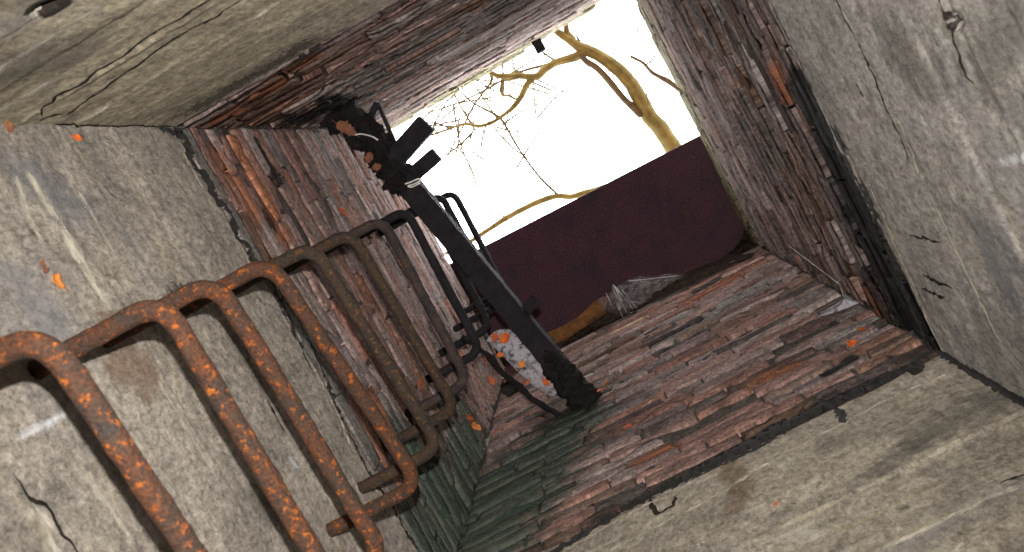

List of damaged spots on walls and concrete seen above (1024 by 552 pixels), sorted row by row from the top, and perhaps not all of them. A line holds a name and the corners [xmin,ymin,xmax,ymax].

spalling [23,0,72,19]
crack [40,0,344,263]
crack [549,0,1024,552]
crack [13,473,78,552]
crack [272,282,420,552]